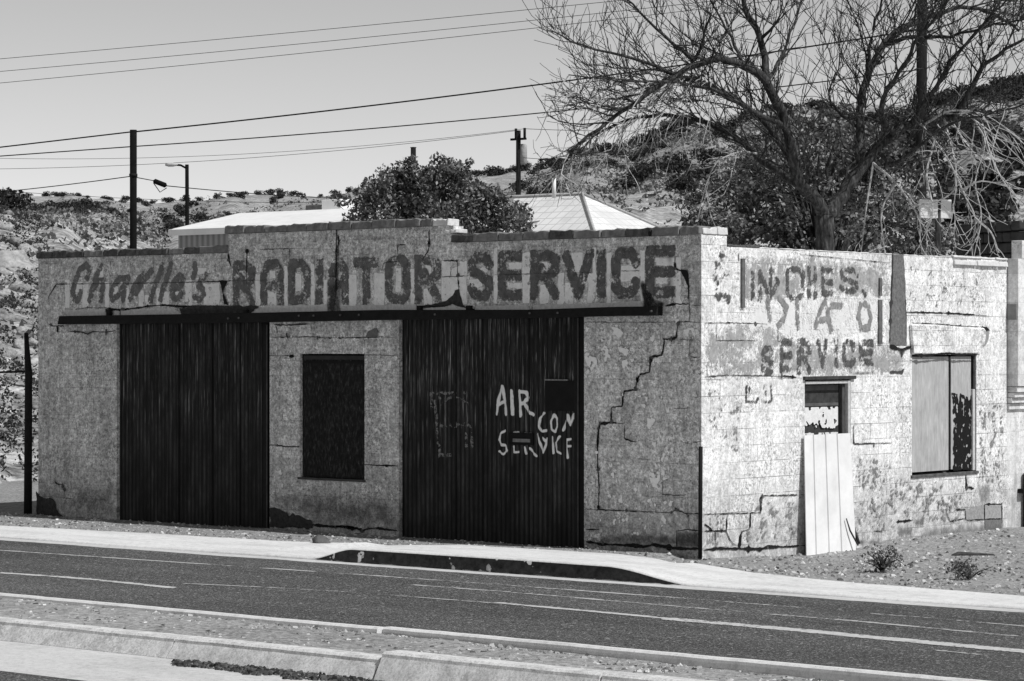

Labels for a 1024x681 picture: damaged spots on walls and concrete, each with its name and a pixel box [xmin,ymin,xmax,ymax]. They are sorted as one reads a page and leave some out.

crack [585,260,805,553]
peeling [805,406,838,435]
peeling [856,400,1005,538]
spalling [36,492,63,517]
peeling [746,496,802,546]